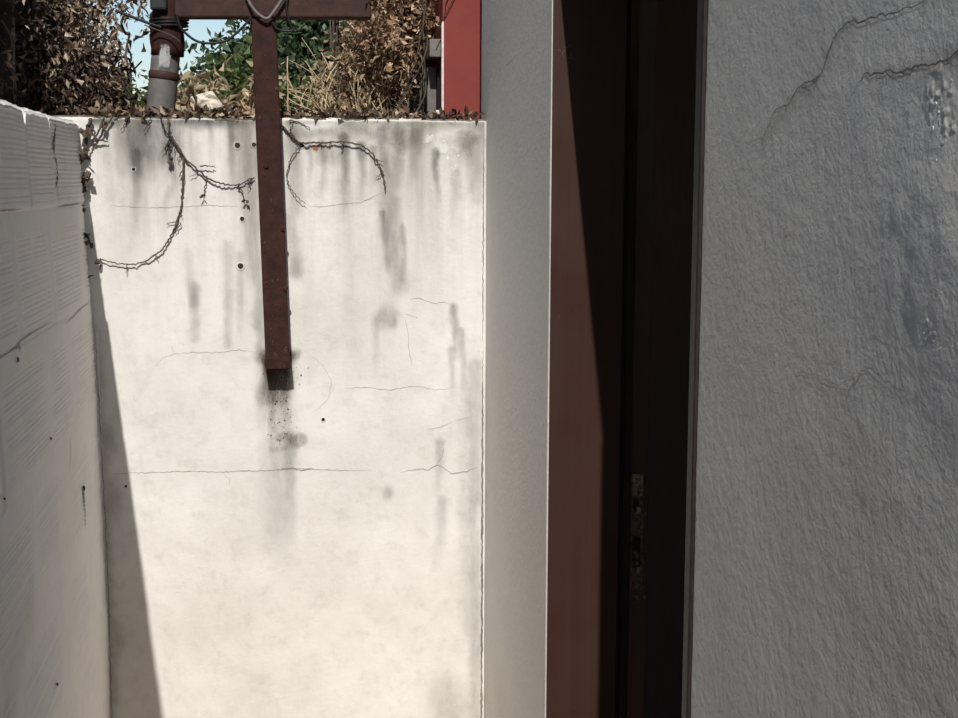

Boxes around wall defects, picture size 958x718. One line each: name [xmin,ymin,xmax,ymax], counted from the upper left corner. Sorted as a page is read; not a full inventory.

crack [745,0,924,150]
crack [850,50,958,97]
rust [260,351,302,445]
crack [0,304,364,718]